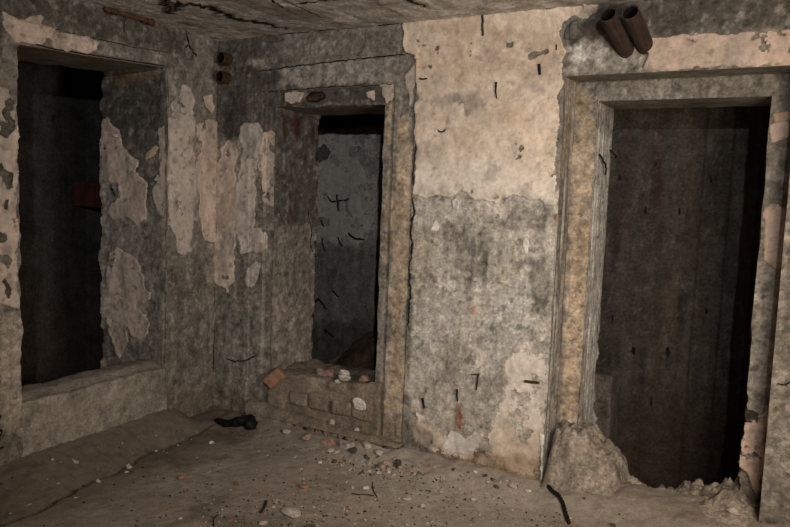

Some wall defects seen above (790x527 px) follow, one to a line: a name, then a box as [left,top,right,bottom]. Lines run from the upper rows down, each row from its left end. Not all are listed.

flaking render [2,11,100,54]
crack [20,29,197,68]
crack [157,0,336,30]
crack [256,53,411,72]
crack [404,0,430,8]
crack [478,15,486,36]
flaking render [643,29,790,71]
crack [261,84,392,93]
flaking render [0,87,20,309]
flaking render [100,84,275,293]
crack [407,141,417,330]
flaking render [101,247,151,359]